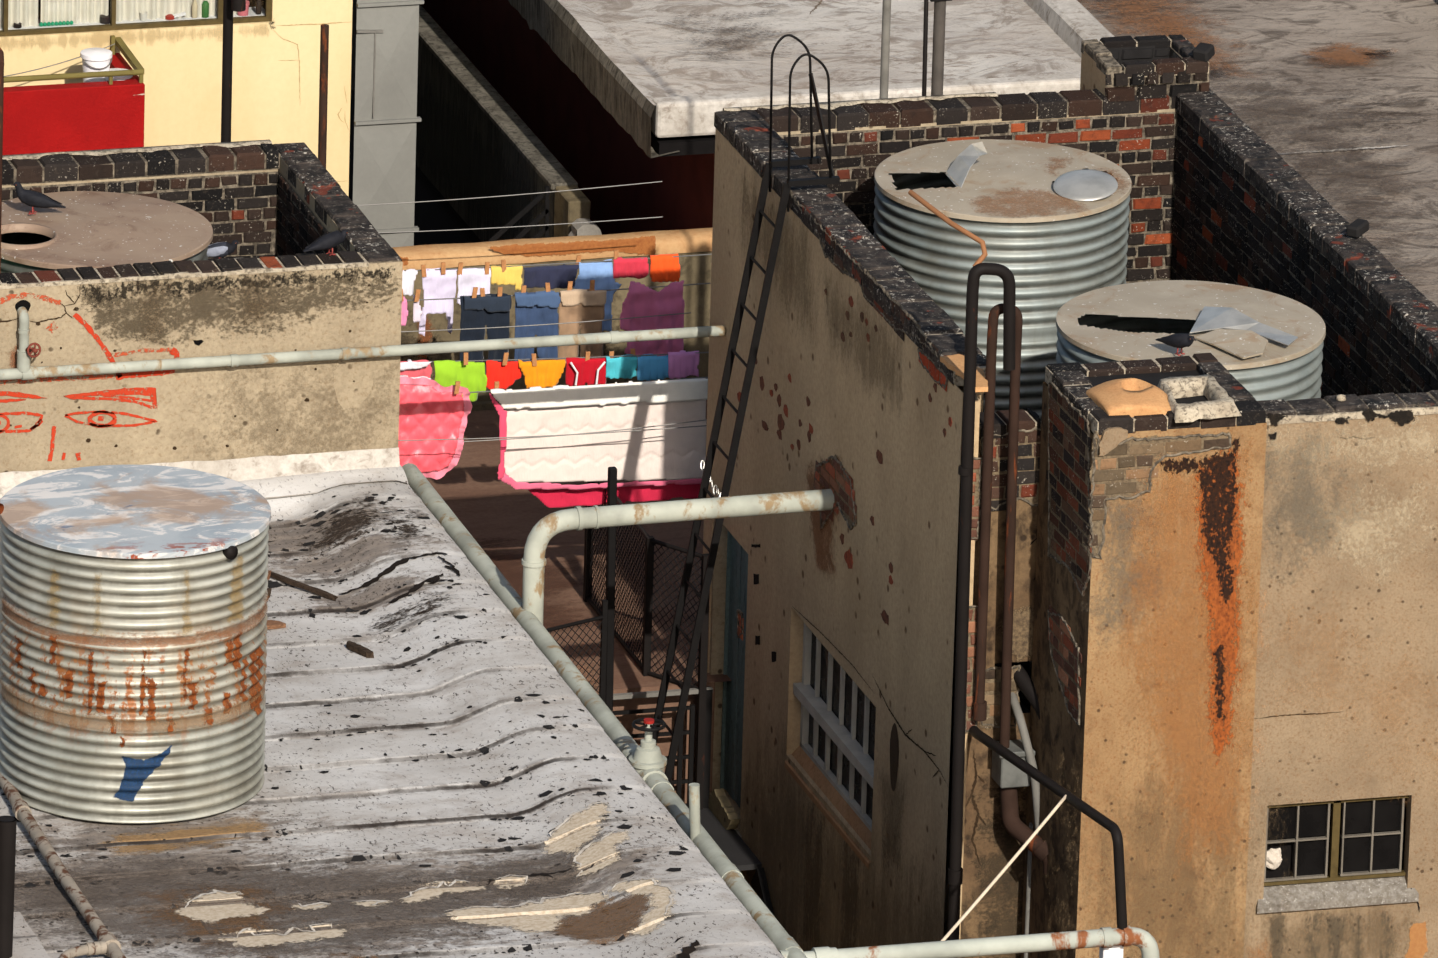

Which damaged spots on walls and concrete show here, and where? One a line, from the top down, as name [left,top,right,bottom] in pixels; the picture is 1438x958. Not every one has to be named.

spalling [755,358,813,450]
flaking render [813,454,874,569]
flaking render [971,381,1232,596]
rust [1161,439,1249,765]
flaking render [965,605,1082,734]
peeling [175,889,346,947]
peeling [352,802,675,936]